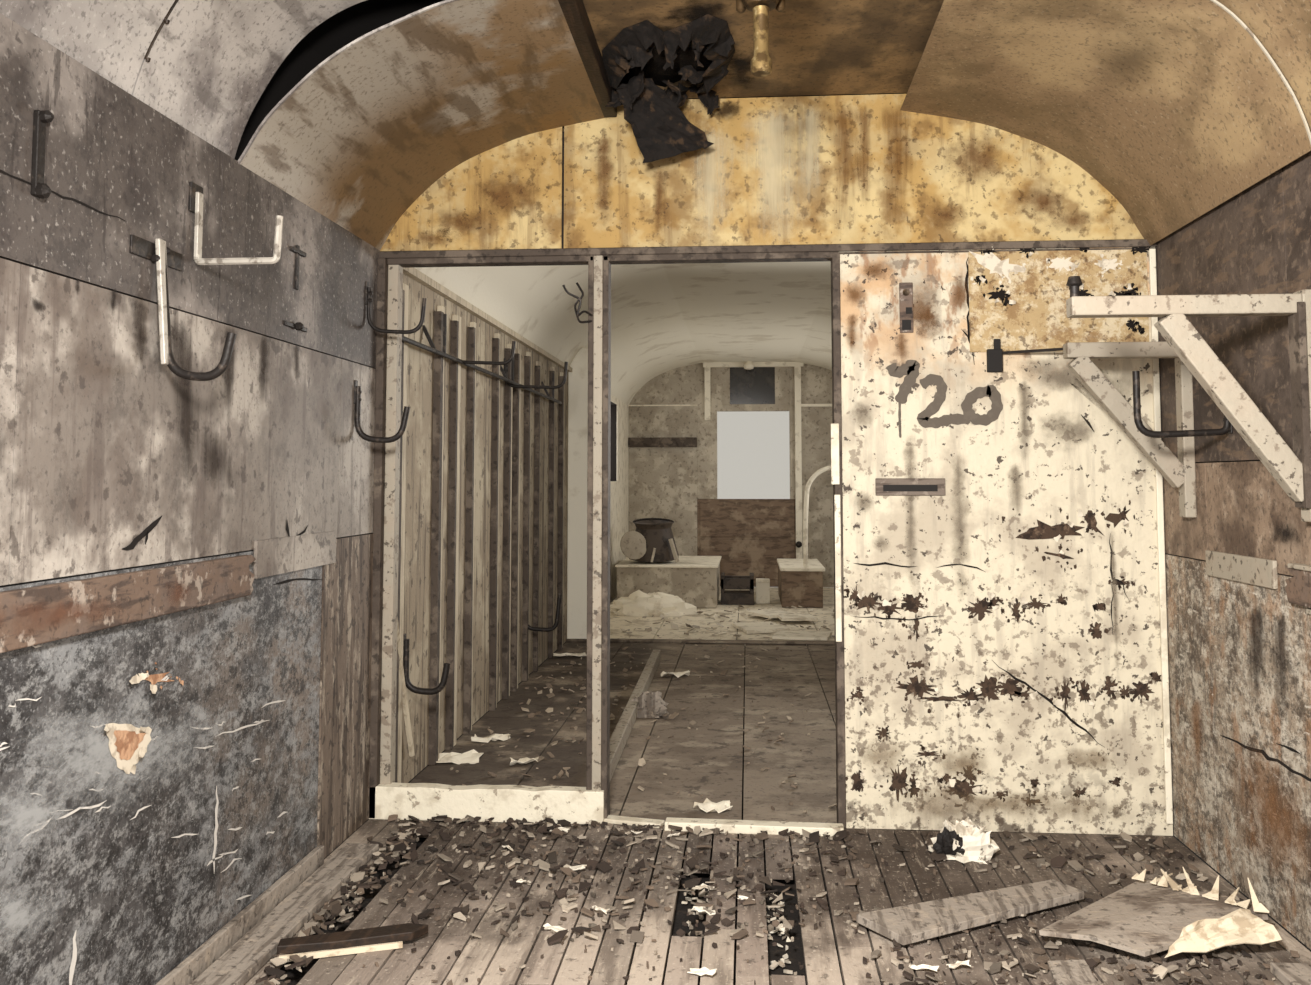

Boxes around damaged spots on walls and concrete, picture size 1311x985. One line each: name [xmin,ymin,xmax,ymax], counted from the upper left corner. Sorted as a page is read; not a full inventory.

corrosion [489,183,527,210]
corrosion [599,139,611,207]
corrosion [840,114,866,181]
corrosion [961,145,993,168]
corrosion [1036,195,1052,210]
peeling [969,246,1154,306]
peeling [1016,500,1135,572]
peeling [844,585,928,642]
peeling [966,592,1068,622]
peeling [896,658,1162,718]
peeling [880,744,1044,807]
crack [1220,735,1311,782]